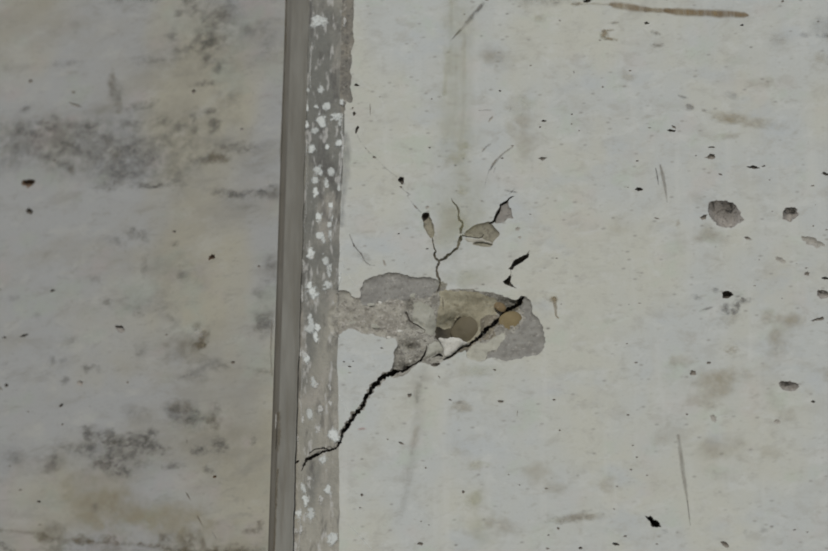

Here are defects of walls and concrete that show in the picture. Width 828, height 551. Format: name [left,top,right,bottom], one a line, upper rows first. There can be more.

corrosion [611,3,748,17]
crack [421,196,514,307]
spalling [700,200,744,228]
crack [295,250,530,471]
spalling [327,260,546,378]